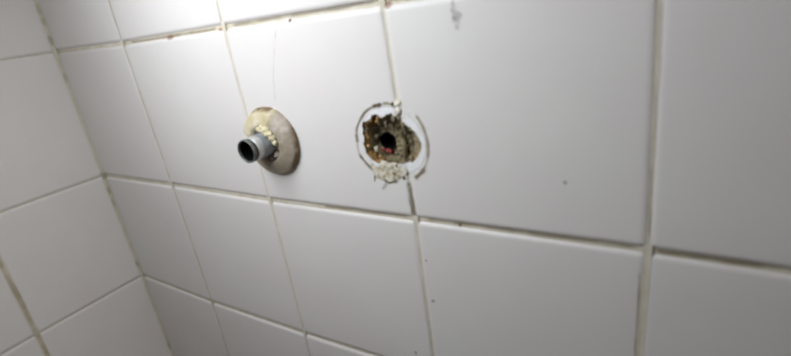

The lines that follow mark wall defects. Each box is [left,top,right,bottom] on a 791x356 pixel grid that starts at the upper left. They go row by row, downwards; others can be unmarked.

spalling [362,113,422,184]